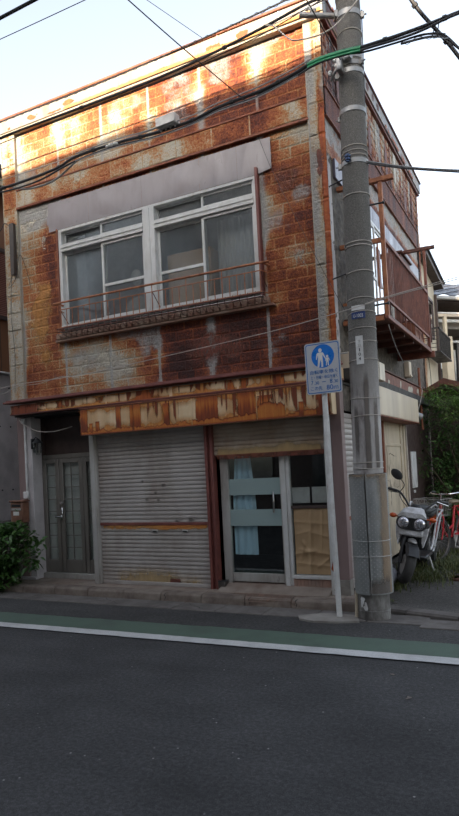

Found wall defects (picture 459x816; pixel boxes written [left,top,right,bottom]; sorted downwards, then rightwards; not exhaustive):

rust [64,7,320,109]
rust [11,370,330,435]